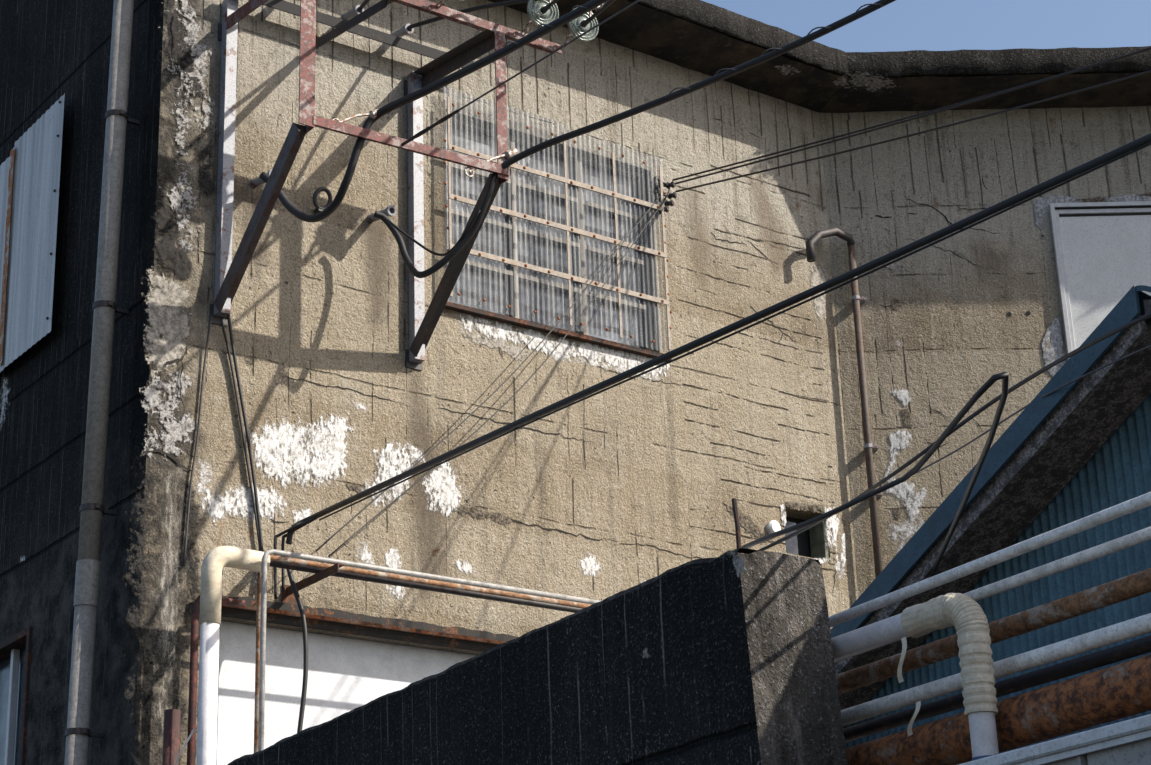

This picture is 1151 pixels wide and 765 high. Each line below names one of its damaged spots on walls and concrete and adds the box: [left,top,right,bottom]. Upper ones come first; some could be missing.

corrosion [0,146,15,364]
spalling [122,0,366,765]
peeling [459,314,672,381]
peeling [360,442,461,517]
spalling [779,501,846,589]
peeling [884,389,927,550]